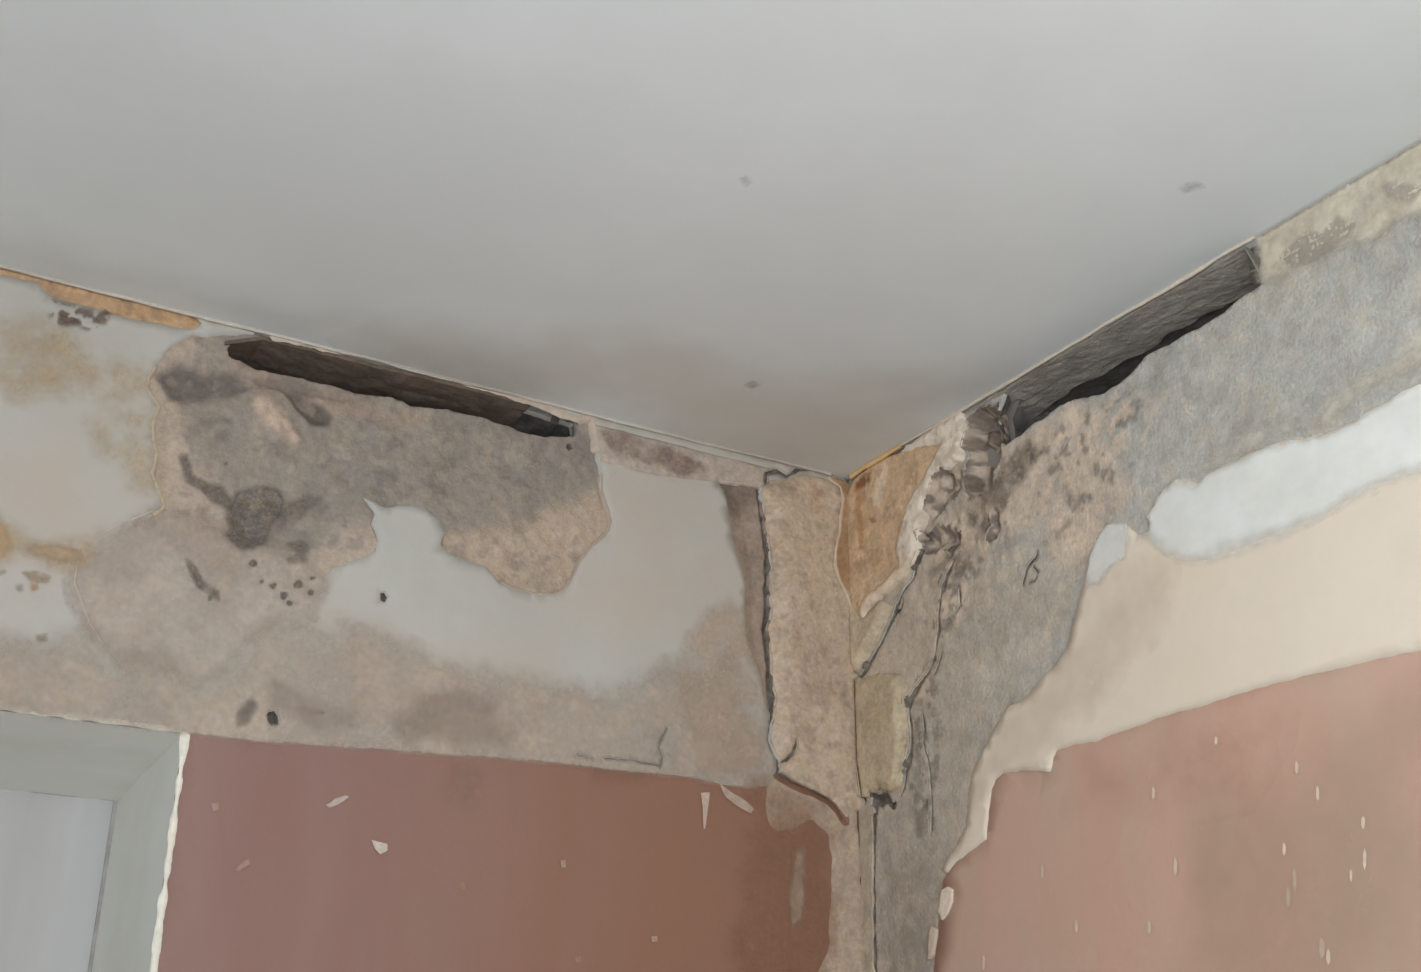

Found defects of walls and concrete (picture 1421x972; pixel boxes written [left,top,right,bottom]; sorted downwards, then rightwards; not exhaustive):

leakage [52,308,109,328]
leakage [180,455,319,605]
spalling [0,269,612,682]
leakage [0,612,770,787]
crack [756,467,962,972]
spalling [701,213,1421,972]